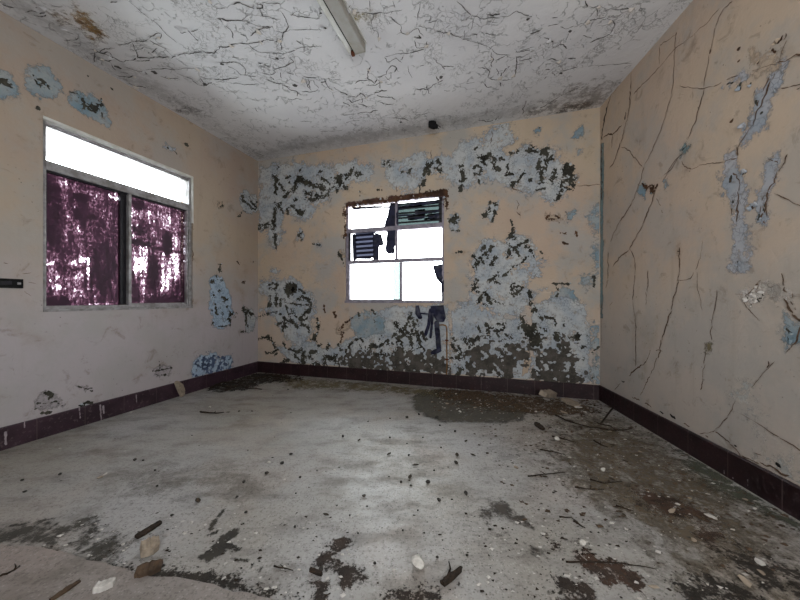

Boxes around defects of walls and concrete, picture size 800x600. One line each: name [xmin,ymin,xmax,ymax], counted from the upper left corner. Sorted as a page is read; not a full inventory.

peeling [34,390,64,416]
peeling [0,64,112,128]
peeling [191,351,234,378]
peeling [208,123,604,384]
crack [60,0,800,477]
peeling [716,35,790,274]